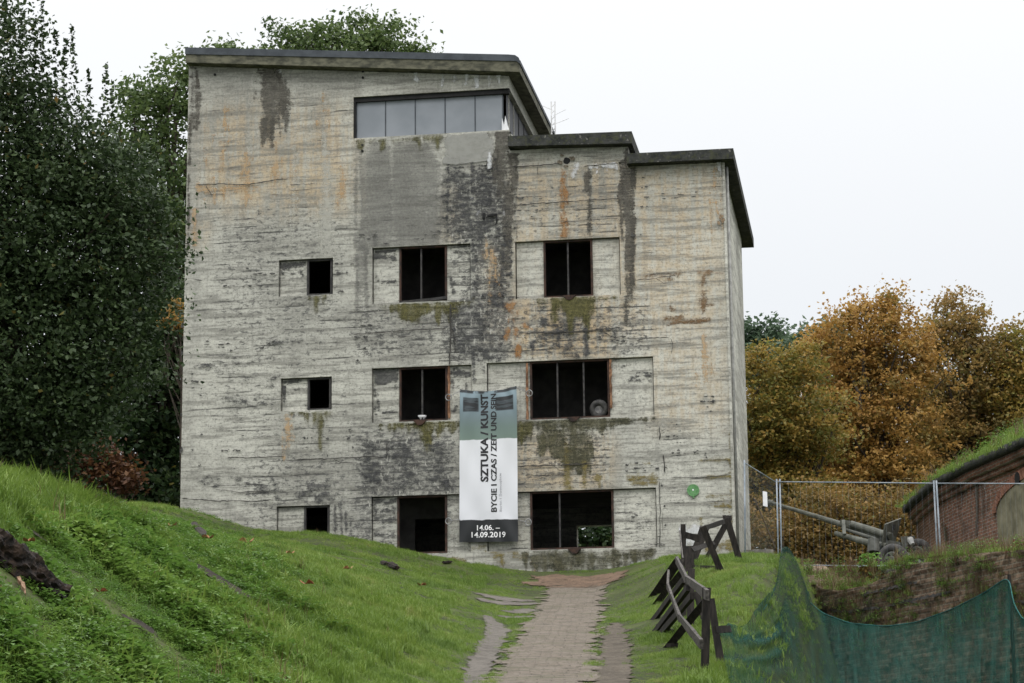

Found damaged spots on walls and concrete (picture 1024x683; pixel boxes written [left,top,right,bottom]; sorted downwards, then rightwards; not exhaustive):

water stain [255,68,291,148]
corrosion [559,171,569,237]
water stain [389,131,519,381]
water stain [528,148,637,359]
water stain [517,417,648,488]